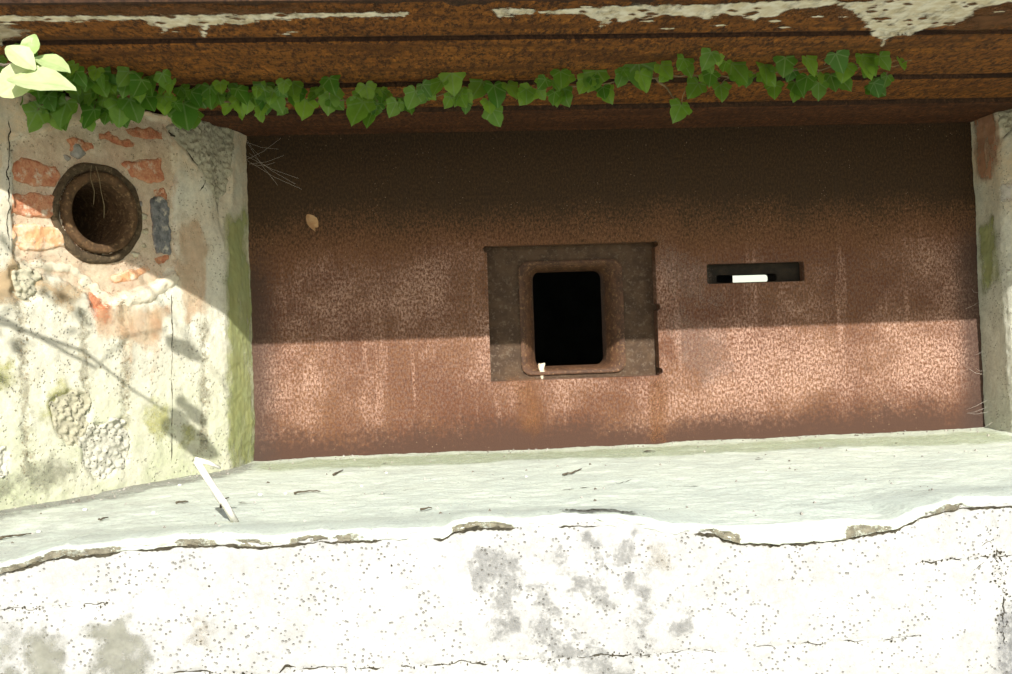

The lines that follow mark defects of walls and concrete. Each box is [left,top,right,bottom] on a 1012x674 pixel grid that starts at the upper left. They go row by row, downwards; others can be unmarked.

peeling [0,11,408,45]
peeling [493,0,1012,46]
flaking render [8,113,235,308]
crack [168,294,176,459]
crack [434,525,514,541]
crack [2,540,381,574]
crack [696,506,1012,649]